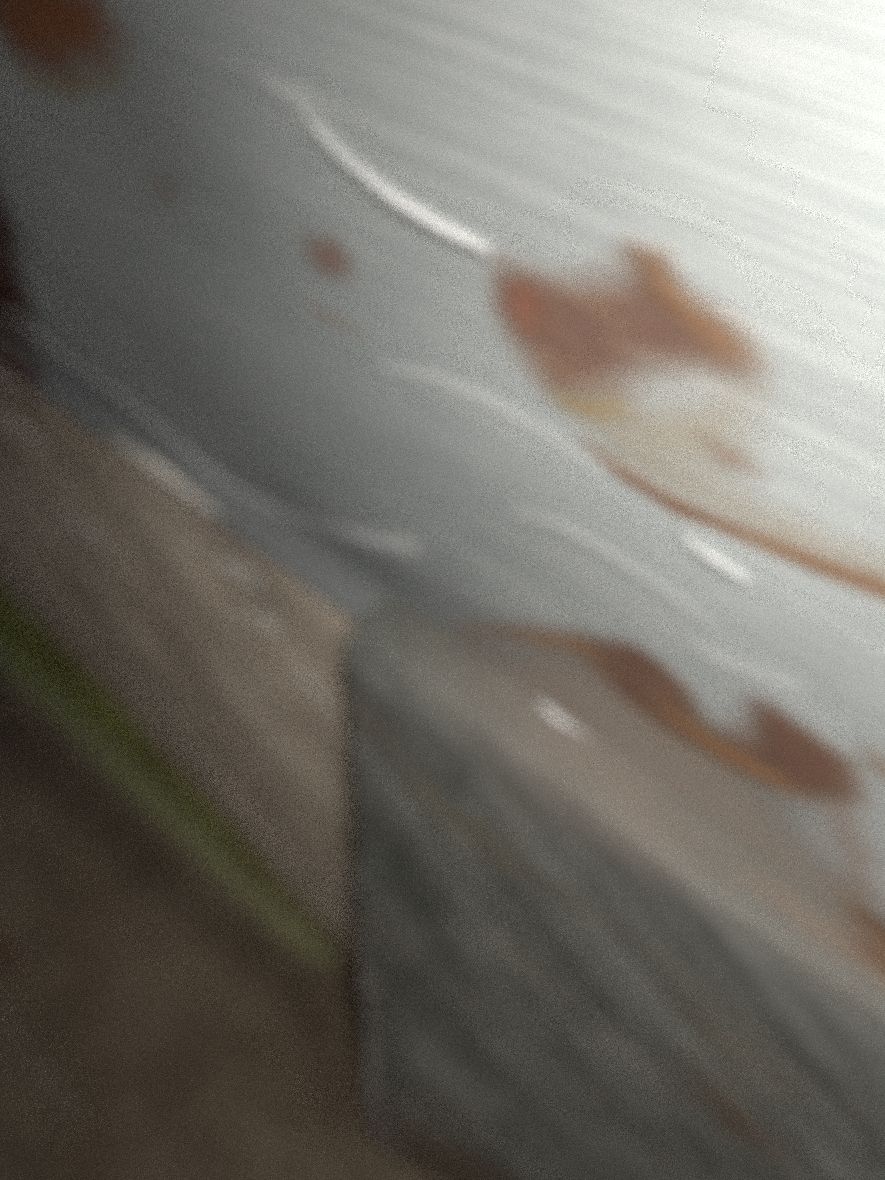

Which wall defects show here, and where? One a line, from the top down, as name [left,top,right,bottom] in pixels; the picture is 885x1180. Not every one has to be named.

rust [0,0,105,66]
rust [0,212,27,324]
rust [507,264,732,413]
rust [609,462,885,594]
rust [515,631,850,794]